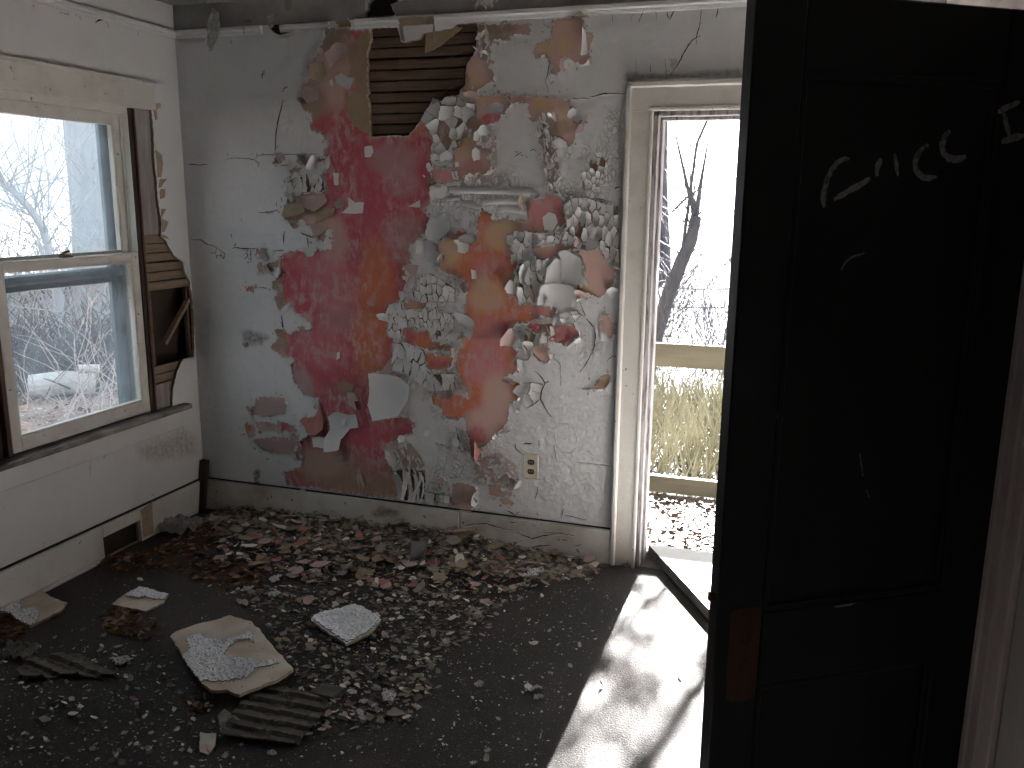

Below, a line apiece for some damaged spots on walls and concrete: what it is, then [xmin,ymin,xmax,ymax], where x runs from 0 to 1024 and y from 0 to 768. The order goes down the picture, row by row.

crack [664,8,718,78]
spalling [144,150,192,395]
crack [188,69,324,263]
peeling [236,0,620,510]
crack [421,19,626,548]